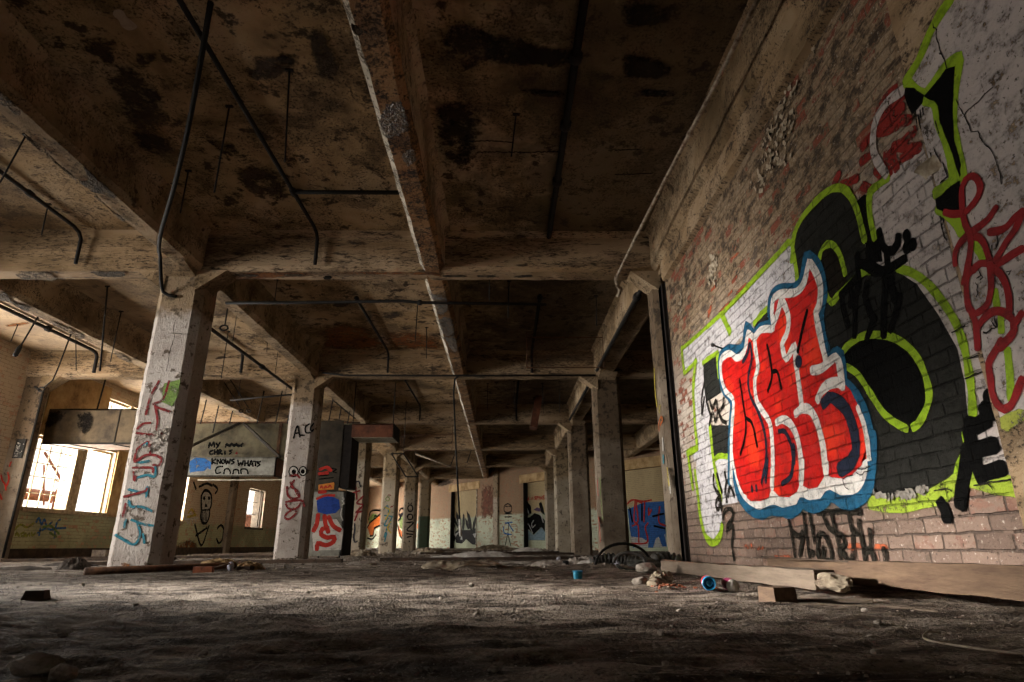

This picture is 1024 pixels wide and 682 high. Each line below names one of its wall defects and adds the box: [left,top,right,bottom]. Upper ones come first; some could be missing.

damp [442,21,570,71]
crack [933,25,947,69]
damp [81,38,173,154]
damp [622,55,675,97]
damp [436,102,482,169]
peeling [750,80,797,193]
crack [930,121,948,184]
crack [956,87,1002,184]
damp [238,166,286,201]
damp [45,411,63,427]
damp [77,412,93,433]